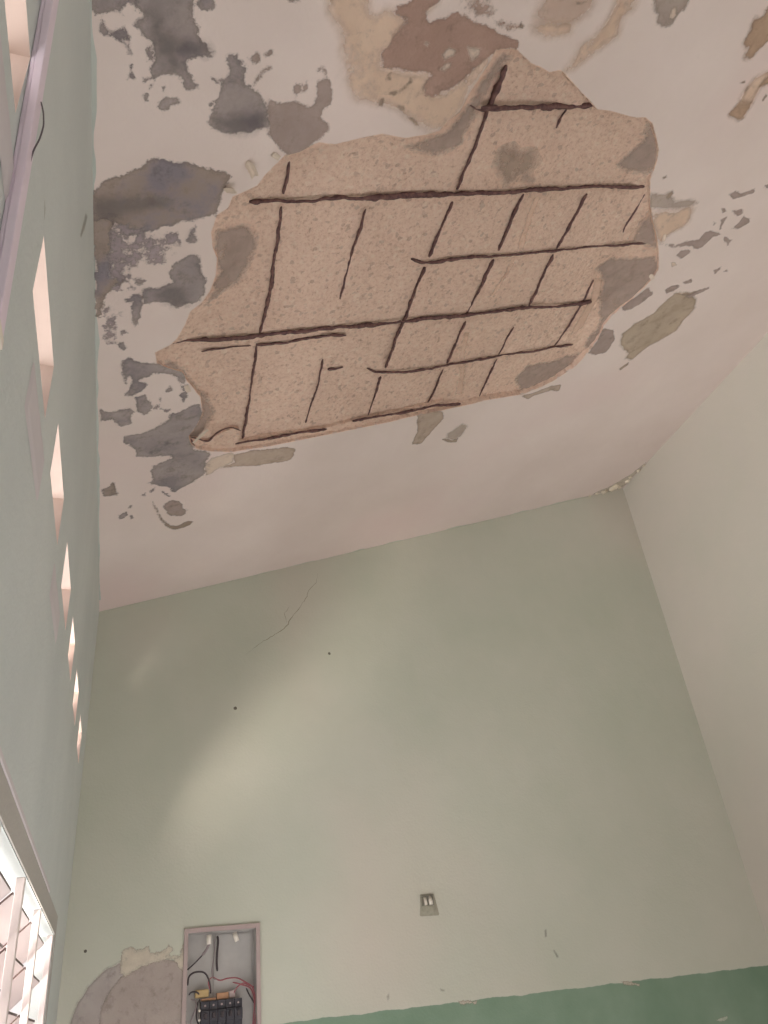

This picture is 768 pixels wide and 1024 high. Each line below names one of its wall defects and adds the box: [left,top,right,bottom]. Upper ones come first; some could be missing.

spalling [92,0,768,497]
damp [157,500,192,529]
flaking render [71,945,184,1024]